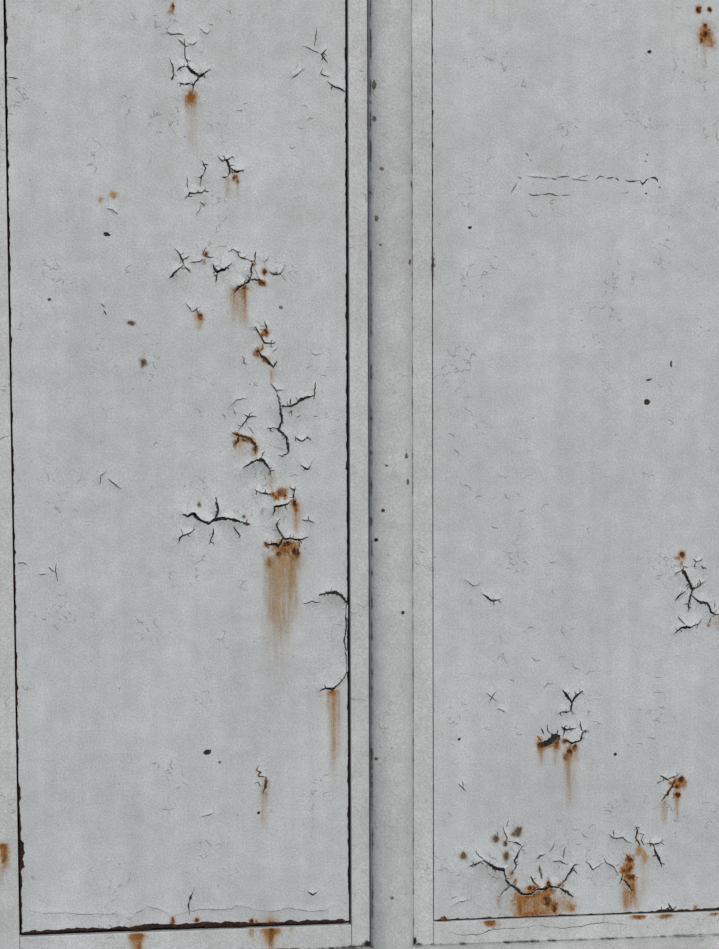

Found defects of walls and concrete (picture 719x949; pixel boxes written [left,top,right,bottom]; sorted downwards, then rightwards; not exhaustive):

crack [195,10,231,40]
corrosion [696,6,714,47]
corrosion [5,0,19,764]
crack [218,348,267,478]
corrosion [264,540,301,584]
peeling [292,579,348,701]
corrosion [537,738,577,767]
crack [246,757,277,803]
crack [649,765,688,811]
corrosion [664,776,687,806]
corrosion [0,784,347,949]
corrosion [433,808,719,927]